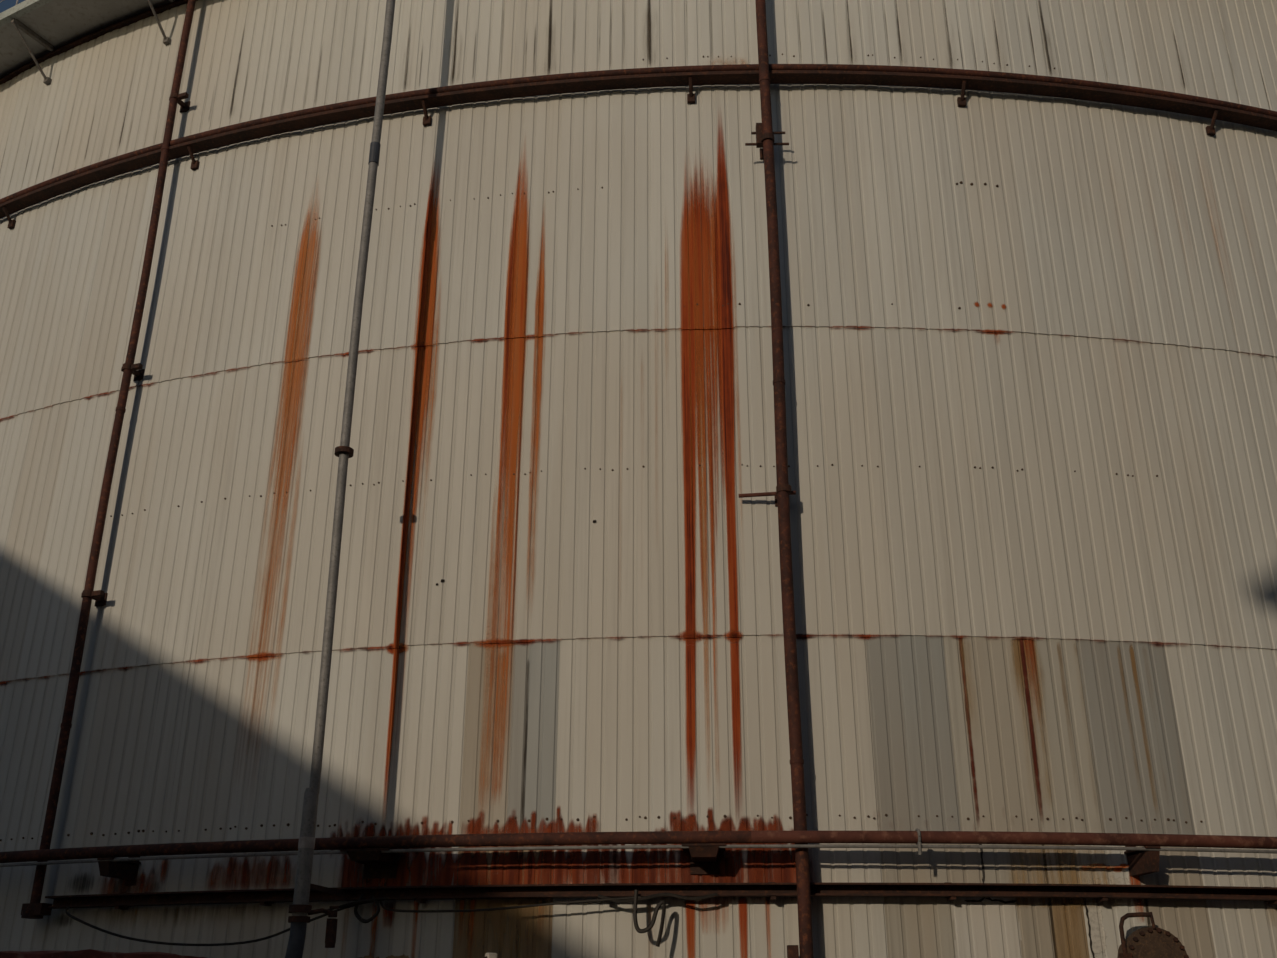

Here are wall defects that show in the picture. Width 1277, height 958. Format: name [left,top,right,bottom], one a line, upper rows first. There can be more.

leakage [534,3,552,70]
leakage [1029,1,1051,72]
corrosion [239,213,317,700]
corrosion [333,131,797,958]
corrosion [955,636,979,818]
corrosion [1013,636,1042,814]